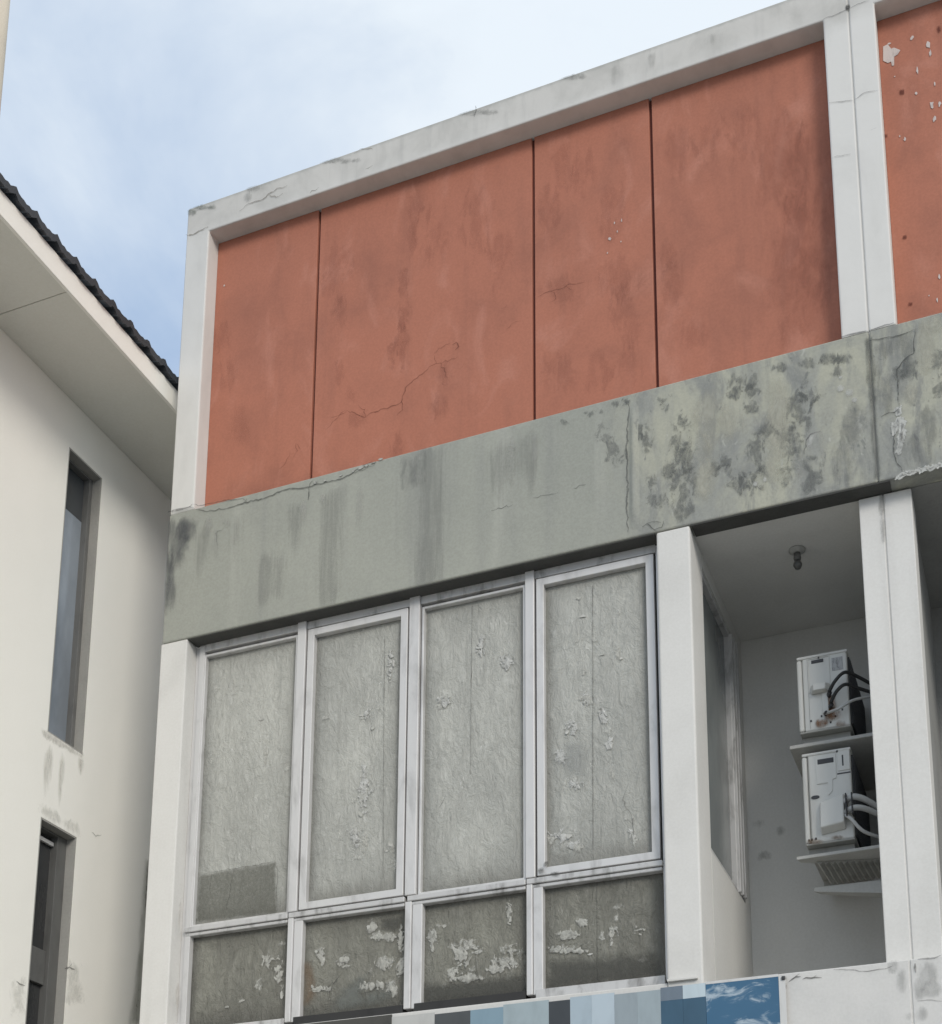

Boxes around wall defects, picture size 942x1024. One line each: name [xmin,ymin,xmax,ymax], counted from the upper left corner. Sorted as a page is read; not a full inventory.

peeling [883,43,900,77]
crack [842,322,916,473]
crack [625,404,664,532]
spalling [896,462,942,480]
crack [169,462,375,545]
peeling [261,941,284,999]
peeling [313,943,350,968]
peeling [360,918,405,998]
peeling [442,939,520,987]
peeling [548,918,594,956]
peeling [599,907,619,946]